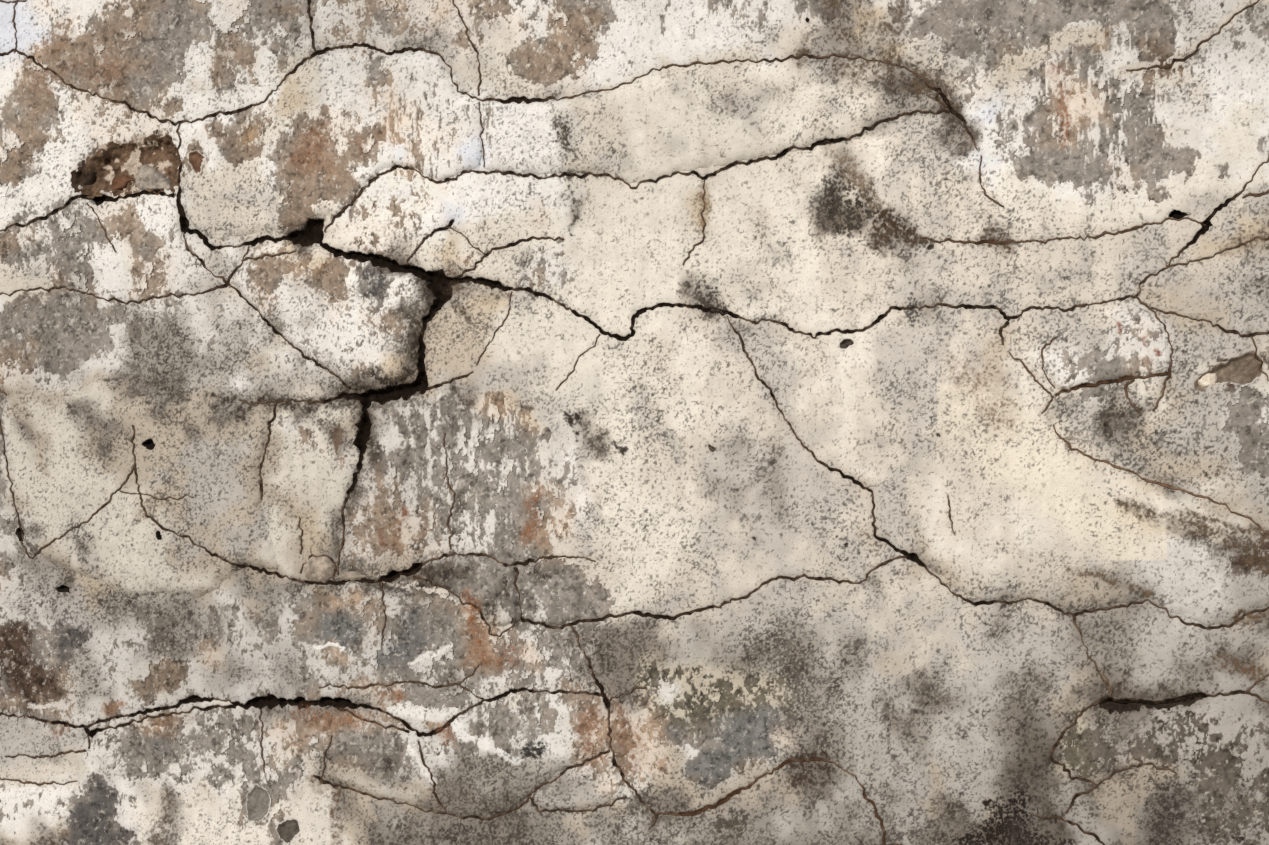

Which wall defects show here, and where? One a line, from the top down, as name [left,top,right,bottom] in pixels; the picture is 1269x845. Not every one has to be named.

crack [0,0,1269,585]
peeling [795,0,845,25]
leakage [819,147,933,252]
peeling [888,0,1201,219]
peeling [1244,0,1259,31]
peeling [0,0,792,845]
crack [0,315,1269,845]